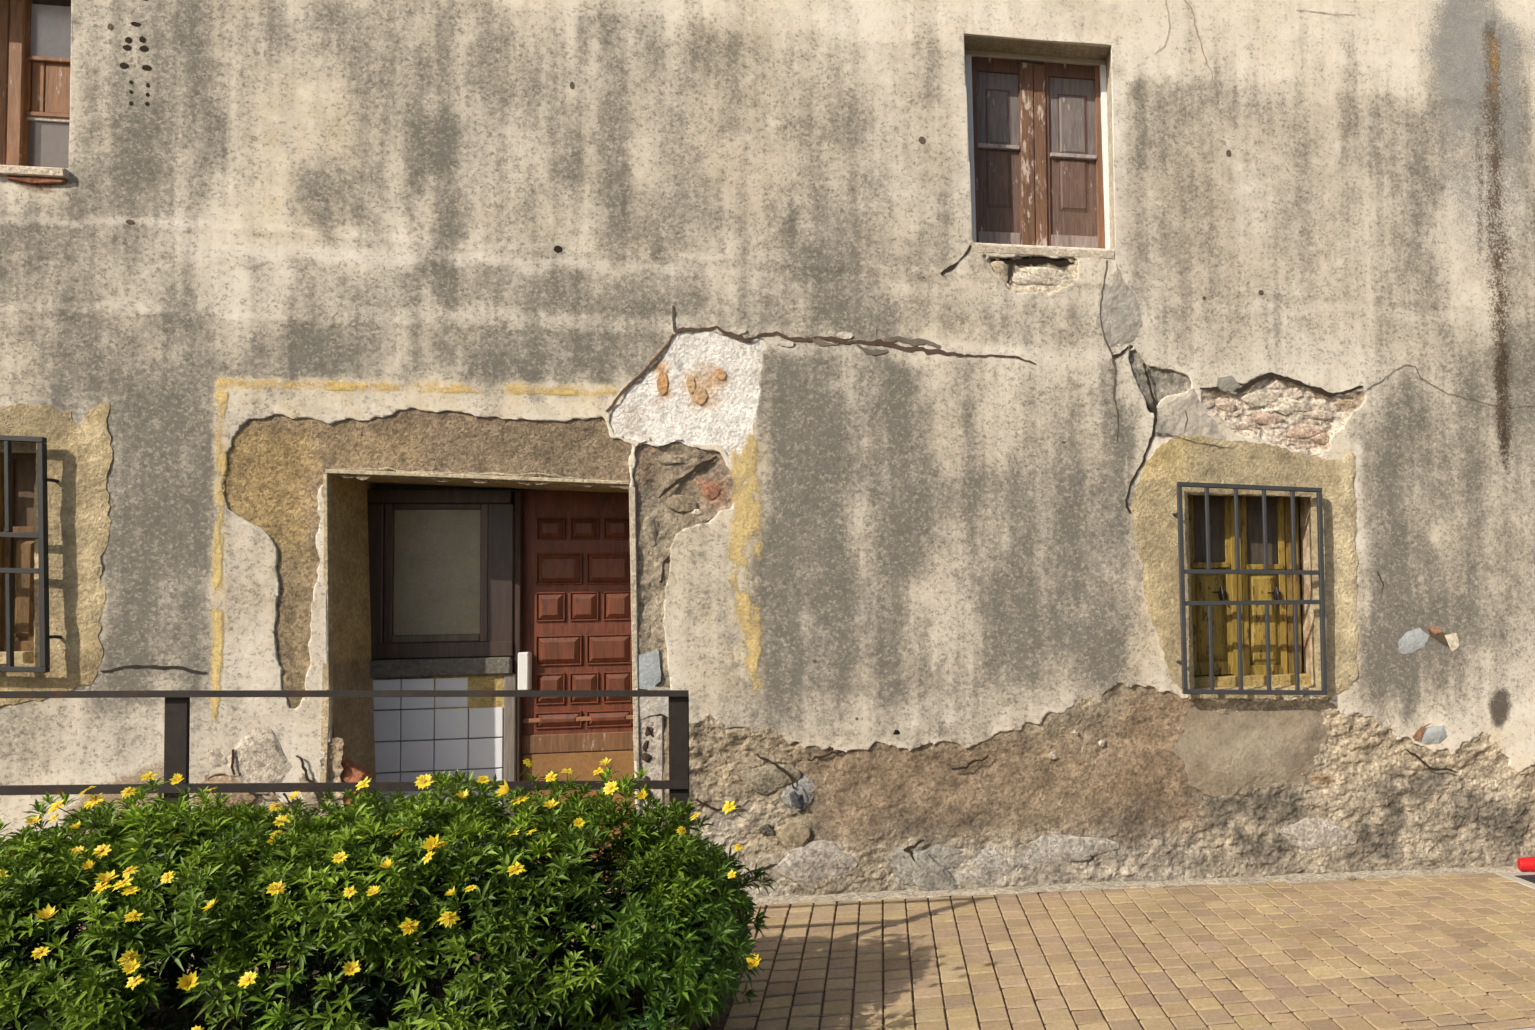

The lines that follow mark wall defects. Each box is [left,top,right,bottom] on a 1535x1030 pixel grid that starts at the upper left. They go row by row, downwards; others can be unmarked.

crack [1155,0,1218,92]
damp [1427,0,1535,260]
spalling [983,255,1079,293]
crack [606,305,1036,412]
crack [1100,260,1235,513]
spalling [212,331,765,709]
peeling [210,608,223,721]
spalling [689,346,1535,897]
peeling [69,764,164,835]
spalling [192,726,344,829]
spalling [651,713,669,825]